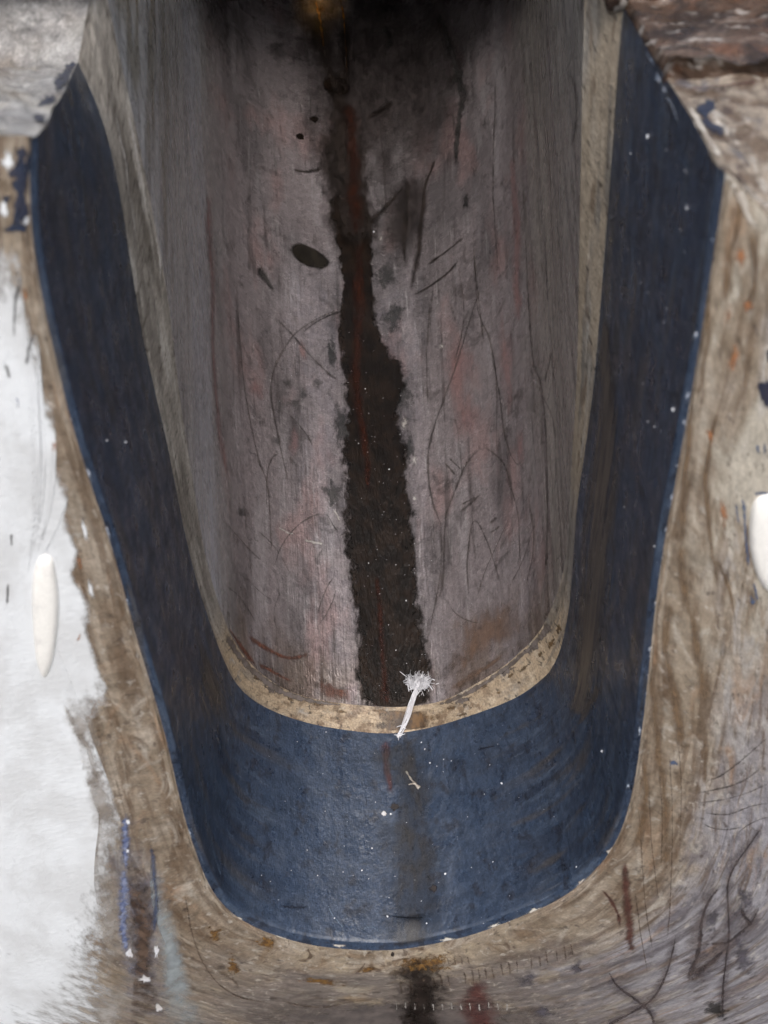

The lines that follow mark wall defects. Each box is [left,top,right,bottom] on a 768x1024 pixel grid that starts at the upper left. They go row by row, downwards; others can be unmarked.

spalling [33,62,75,127]
damp [439,15,467,162]
spalling [690,108,721,155]
spalling [0,146,30,232]
spalling [724,174,755,225]
damp [295,162,461,707]
peeling [0,257,118,1024]
corrosion [604,865,634,950]
crack [609,831,759,1024]